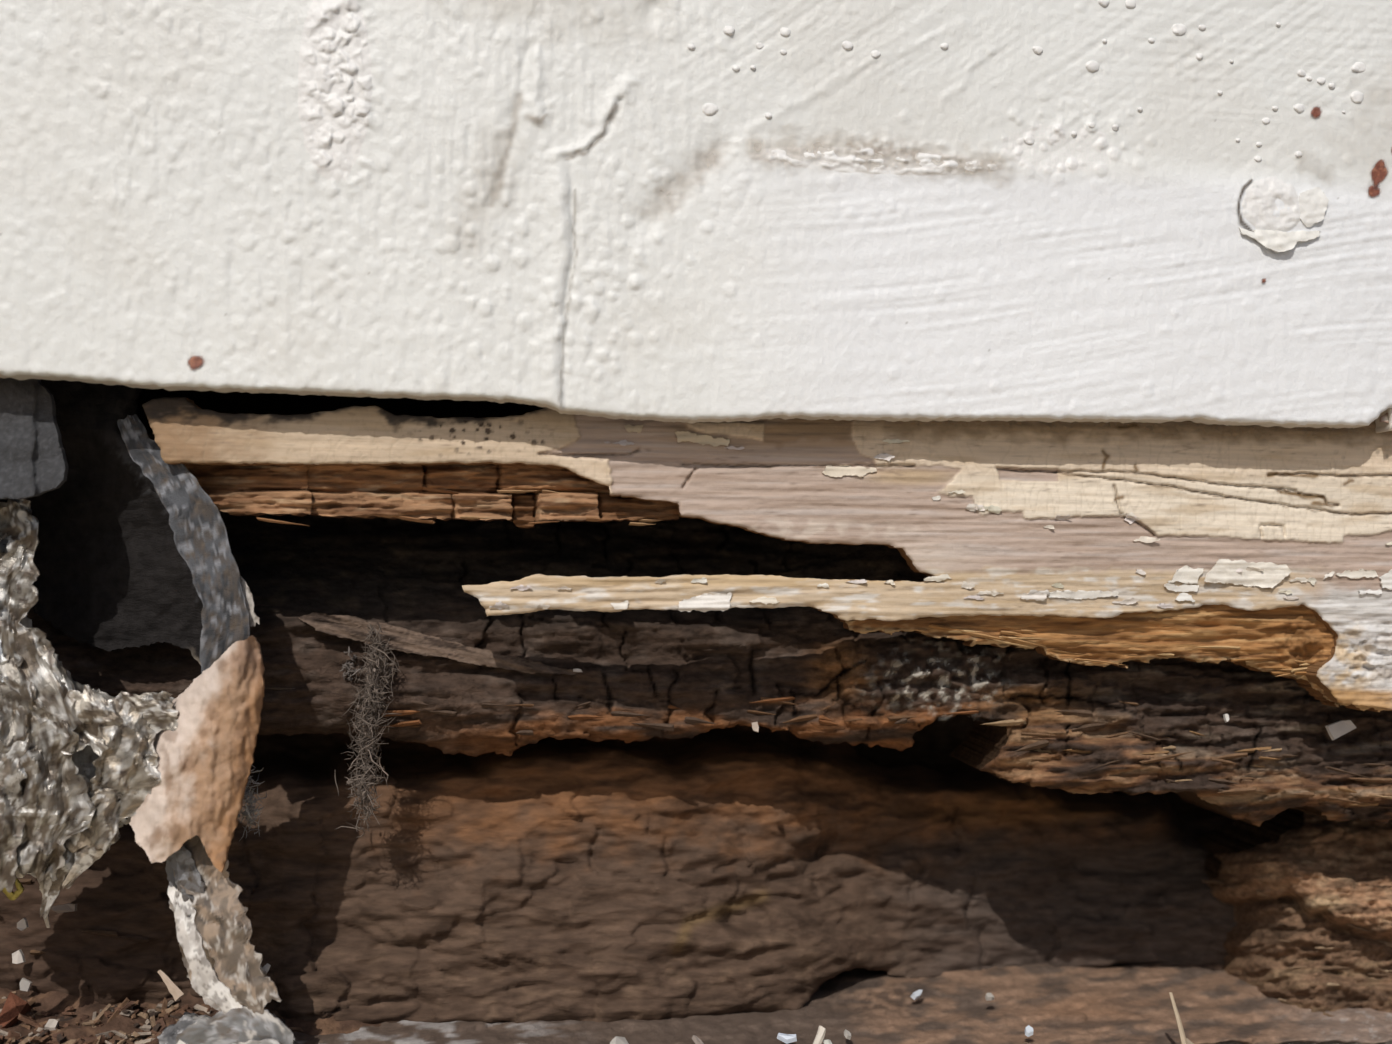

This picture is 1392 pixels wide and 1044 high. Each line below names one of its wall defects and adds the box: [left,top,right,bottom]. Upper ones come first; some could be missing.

corrosion [1368,160,1388,197]
corrosion [188,356,203,369]
peeling [822,439,910,478]
crack [1051,425,1152,500]
crack [1268,473,1391,507]
peeling [610,600,629,609]
peeling [678,577,732,612]
peeling [749,596,779,605]
spalling [840,559,1392,712]
peeling [12,949,32,992]
peeling [44,1019,59,1031]
peeling [777,1033,797,1044]